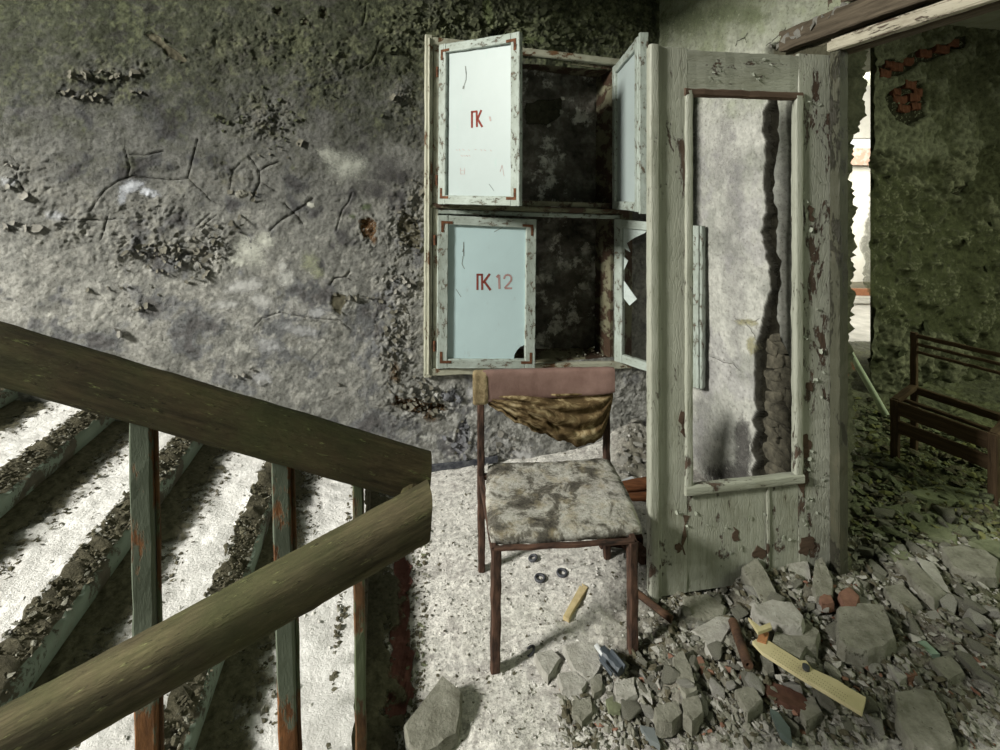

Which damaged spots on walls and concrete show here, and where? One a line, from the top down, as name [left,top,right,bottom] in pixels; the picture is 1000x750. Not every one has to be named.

spalling [762,2,867,66]
flaking render [55,68,144,102]
spalling [875,36,966,125]
crack [59,139,313,240]
flaking render [120,214,244,284]
spalling [331,275,460,418]
peeling [797,434,827,525]
peeling [675,510,697,555]
peeling [752,546,767,560]
peeling [782,535,816,556]